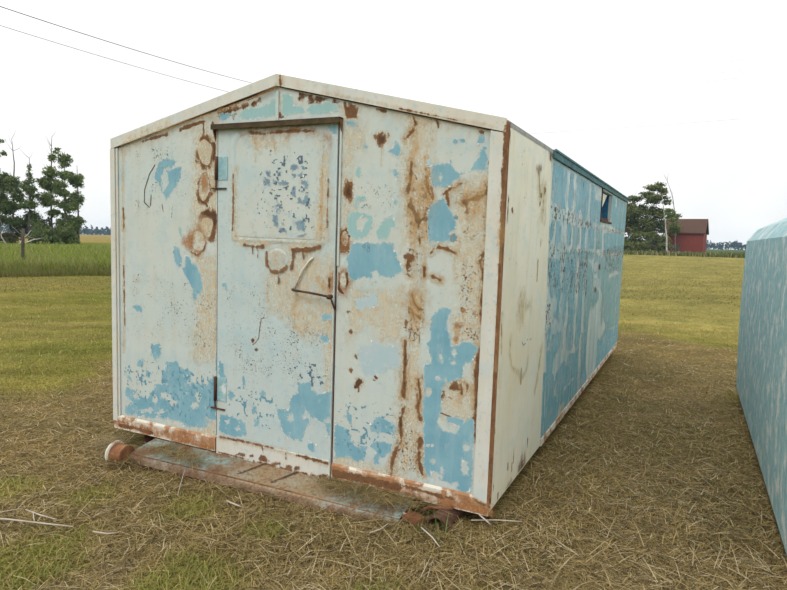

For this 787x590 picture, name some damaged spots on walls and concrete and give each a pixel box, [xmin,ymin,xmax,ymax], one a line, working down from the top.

corrosion [179,75,282,358]
peeling [219,92,339,121]
peeling [124,134,489,493]
corrosion [117,292,498,514]
corrosion [272,155,350,374]
corrosion [399,108,487,339]
corrosion [499,125,513,247]
peeling [538,162,627,437]